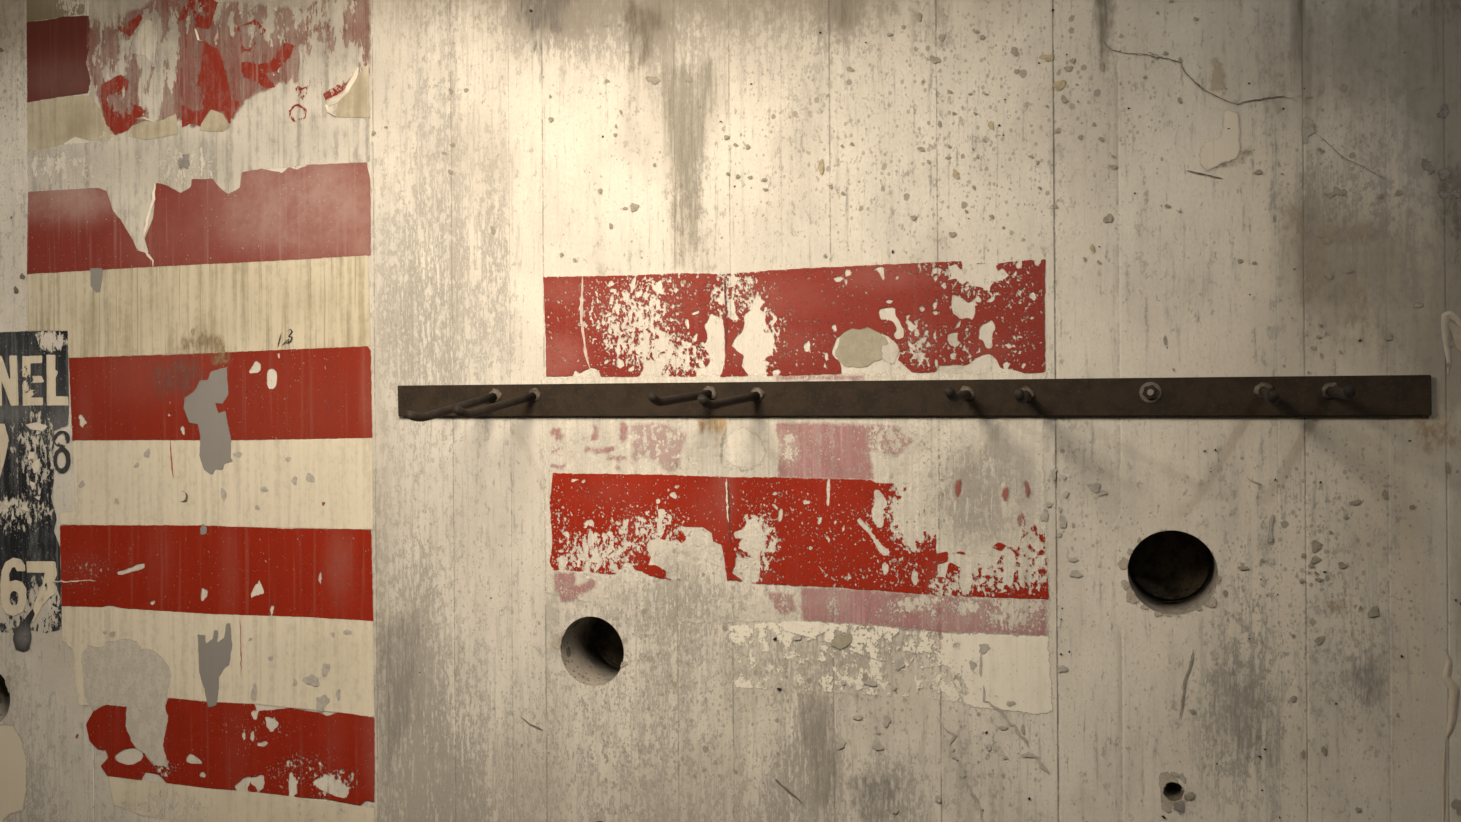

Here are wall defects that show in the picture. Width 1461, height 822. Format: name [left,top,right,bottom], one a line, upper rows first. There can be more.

crack [1102,39,1300,105]
peeling [28,0,388,253]
spalling [783,327,899,380]
peeling [285,457,315,485]
peeling [647,565,666,577]
peeling [724,537,748,580]
spalling [81,631,375,822]